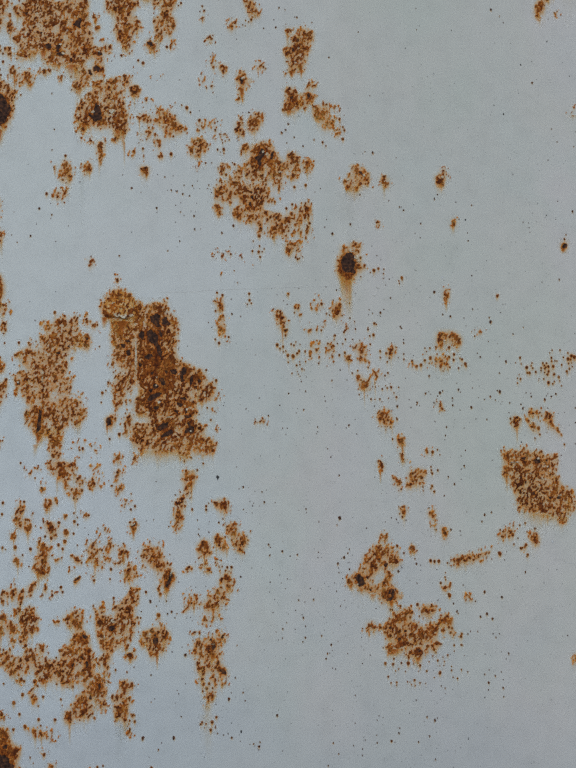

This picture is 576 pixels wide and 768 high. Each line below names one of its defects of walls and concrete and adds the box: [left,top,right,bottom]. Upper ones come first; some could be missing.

corrosion [273,16,345,141]
corrosion [535,0,562,20]
corrosion [0,292,251,768]
corrosion [334,349,576,692]